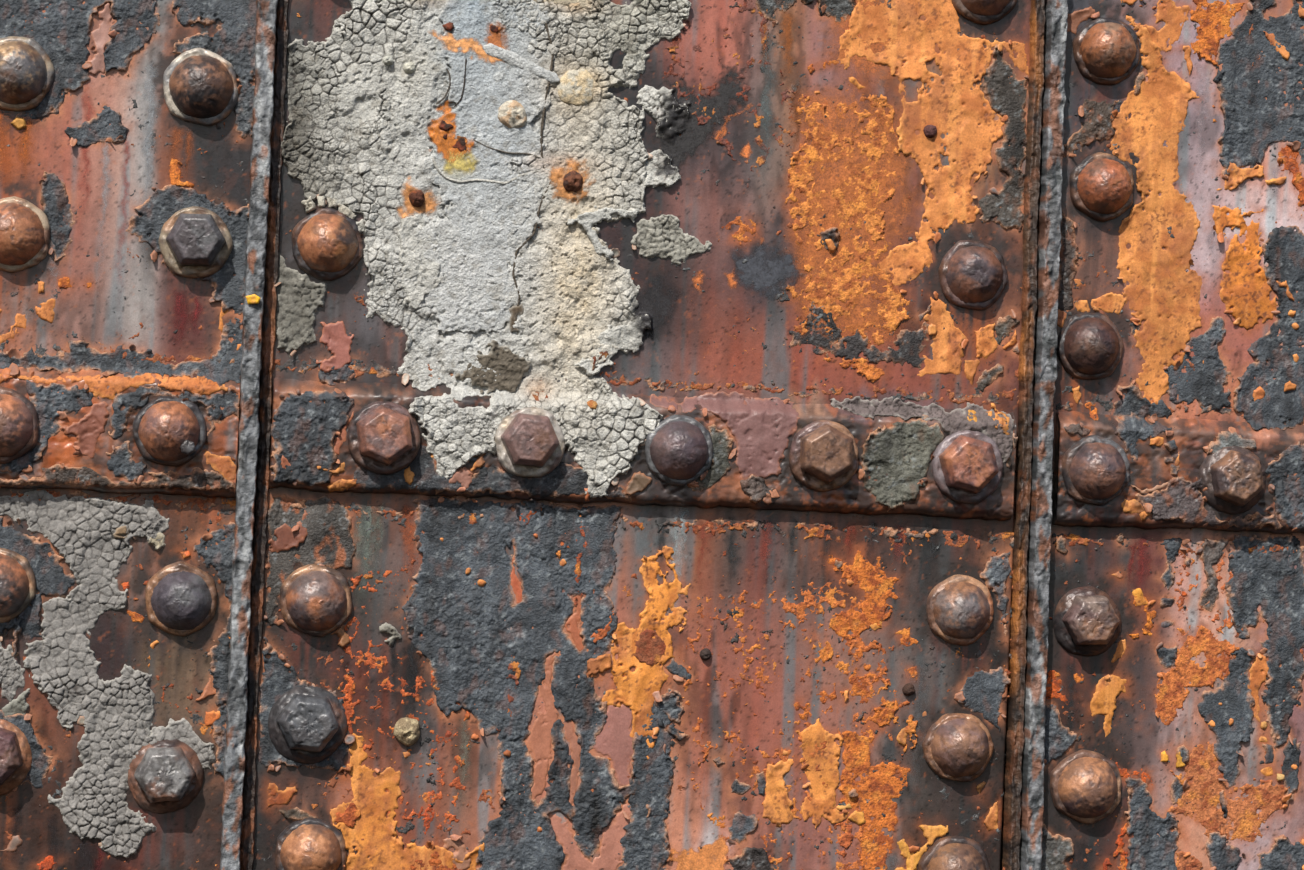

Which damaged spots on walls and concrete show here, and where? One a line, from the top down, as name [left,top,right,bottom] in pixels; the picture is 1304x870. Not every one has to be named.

rust [0,322,228,400]
peeling [0,171,249,858]
peeling [0,0,257,139]
peeling [257,252,356,772]
rust [267,655,485,870]
crack [432,0,554,321]
peeling [281,0,800,870]
rust [600,0,1029,404]
rust [1046,540,1297,842]
rust [1057,0,1304,416]
peeling [1110,225,1304,870]
peeling [1213,0,1304,180]